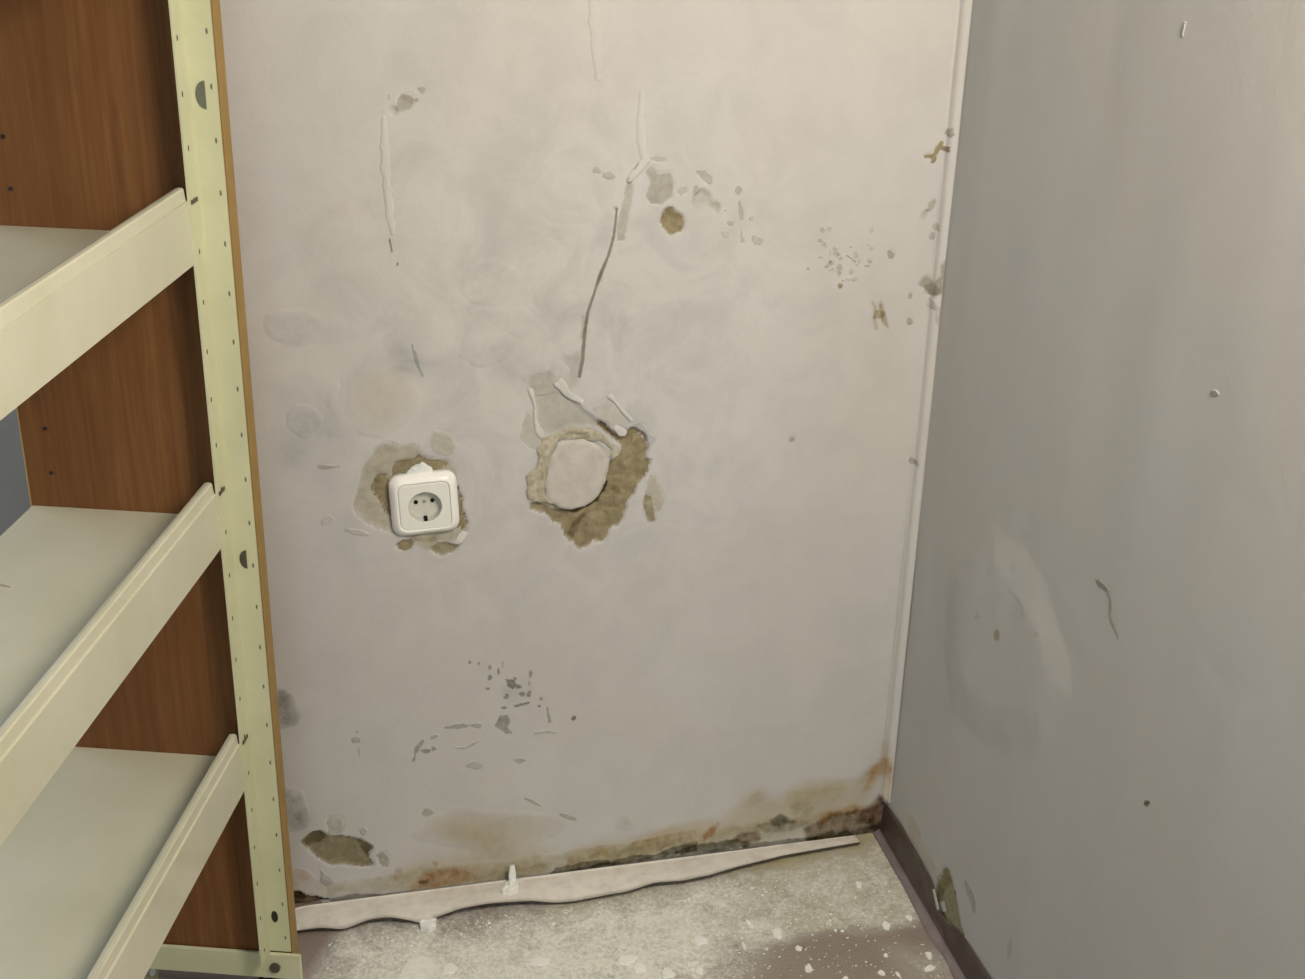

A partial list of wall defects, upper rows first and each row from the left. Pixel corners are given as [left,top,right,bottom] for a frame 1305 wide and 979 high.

peeling [592,155,713,241]
peeling [721,185,764,245]
crack [578,208,618,378]
flaking render [321,429,470,557]
flaking render [519,378,666,551]
damp [285,786,314,832]
flaking render [294,816,390,903]
damp [327,797,698,898]